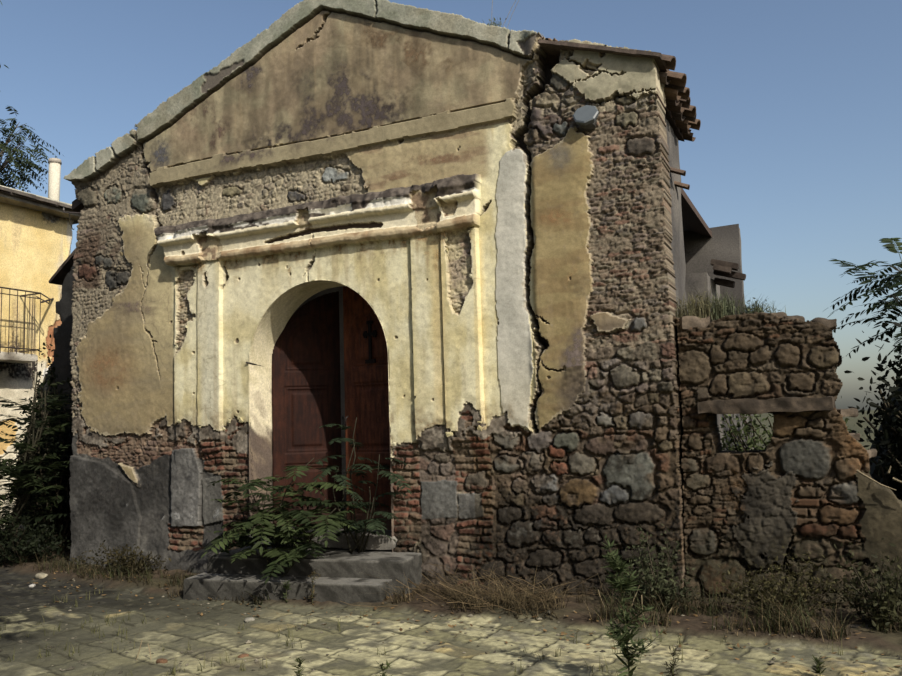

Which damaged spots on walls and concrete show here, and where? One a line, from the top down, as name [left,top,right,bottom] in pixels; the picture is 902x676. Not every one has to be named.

crack [298,11,332,48]
damp [221,72,399,162]
spalling [0,144,369,368]
crack [512,38,656,432]
peeling [0,418,18,454]
spalling [69,399,254,573]